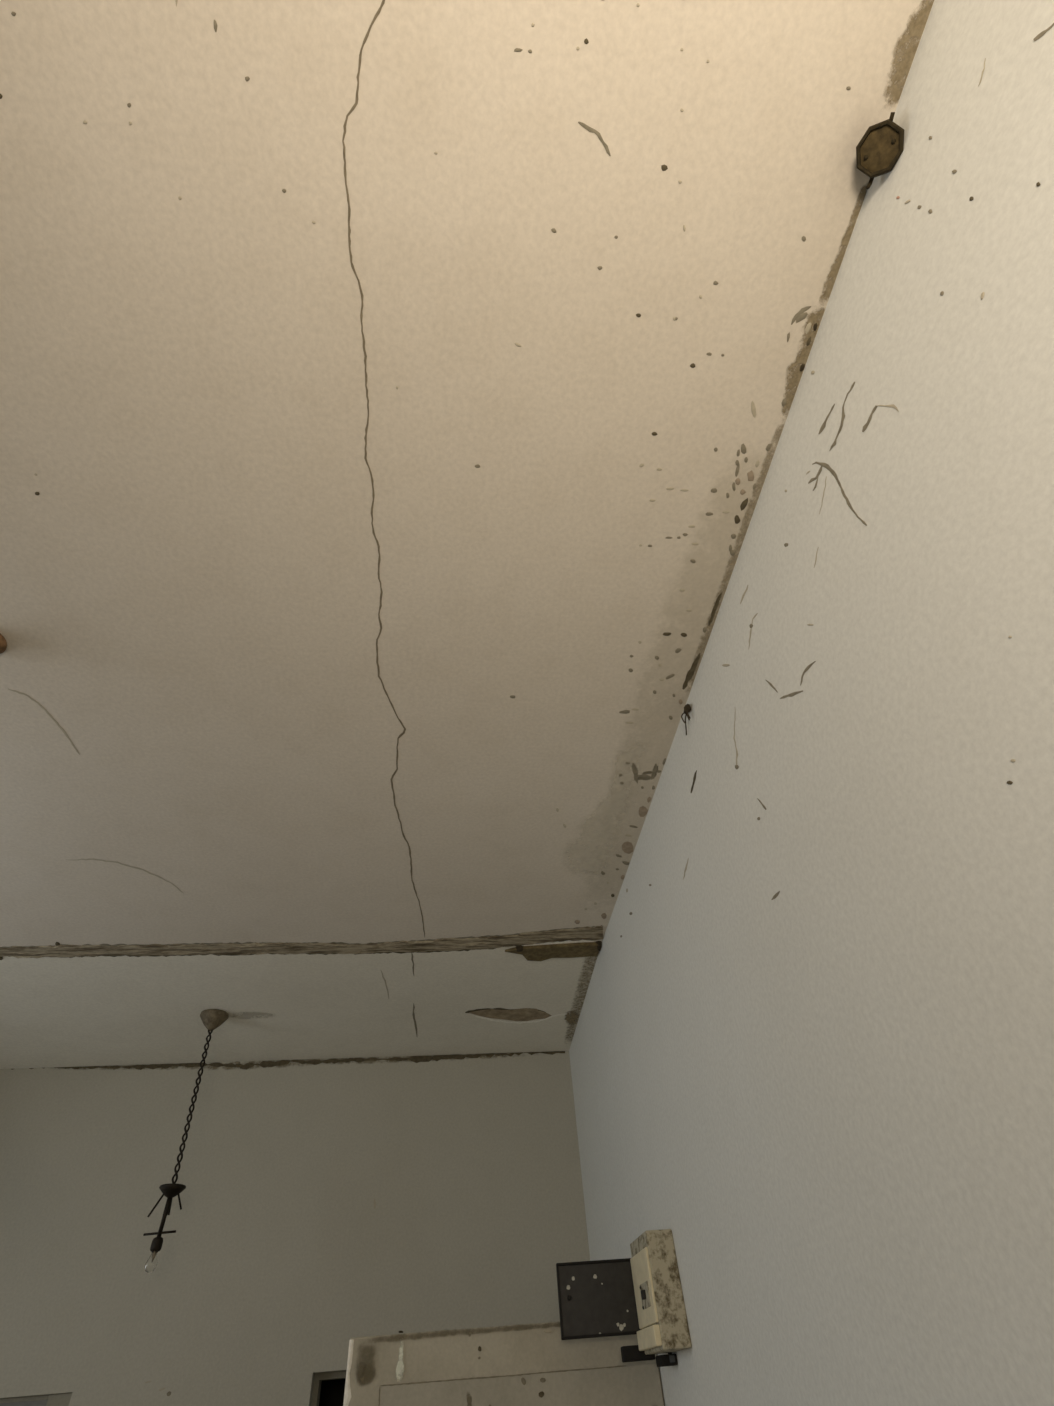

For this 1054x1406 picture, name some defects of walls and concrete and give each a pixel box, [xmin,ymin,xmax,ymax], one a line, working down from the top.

crack [578,122,611,156]
crack [9,0,565,1070]
water stain [689,425,784,683]
crack [731,721,739,765]
water stain [632,763,658,783]
peeling [465,1008,567,1024]